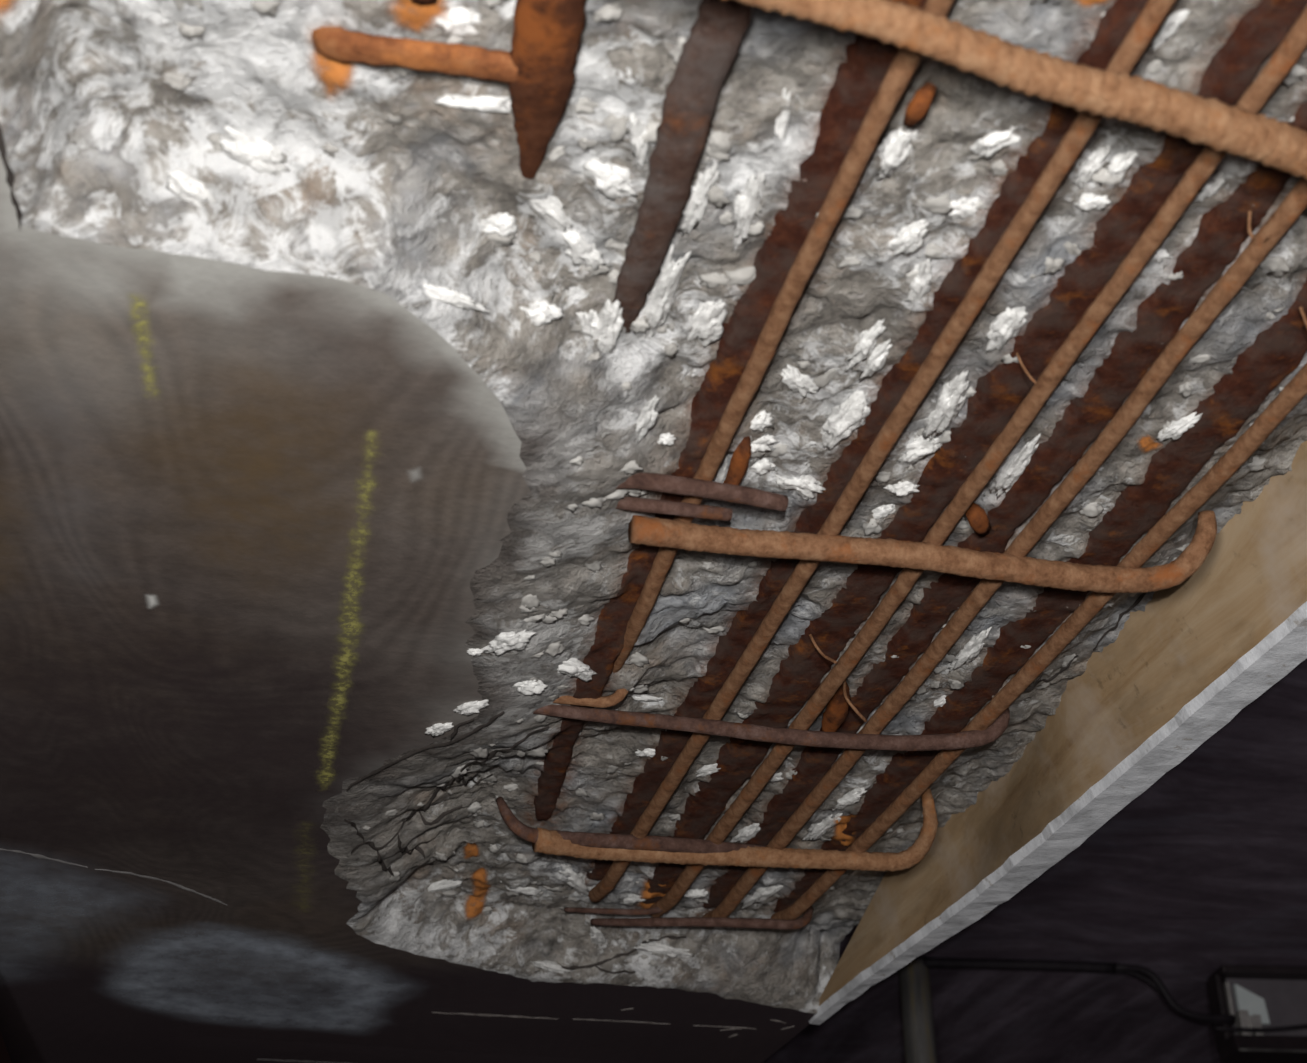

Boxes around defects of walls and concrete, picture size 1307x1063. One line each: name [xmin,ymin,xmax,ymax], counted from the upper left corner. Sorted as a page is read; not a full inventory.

spalling [0,0,887,1014]
crack [344,711,549,877]
rust [667,564,904,840]
rust [671,33,902,478]
rust [744,573,981,851]
spalling [692,55,1052,532]
spalling [785,570,1044,849]
rust [791,101,1080,534]
spalling [839,116,1167,550]
rust [878,133,1307,566]
spalling [942,152,1307,568]
spalling [1129,0,1261,95]